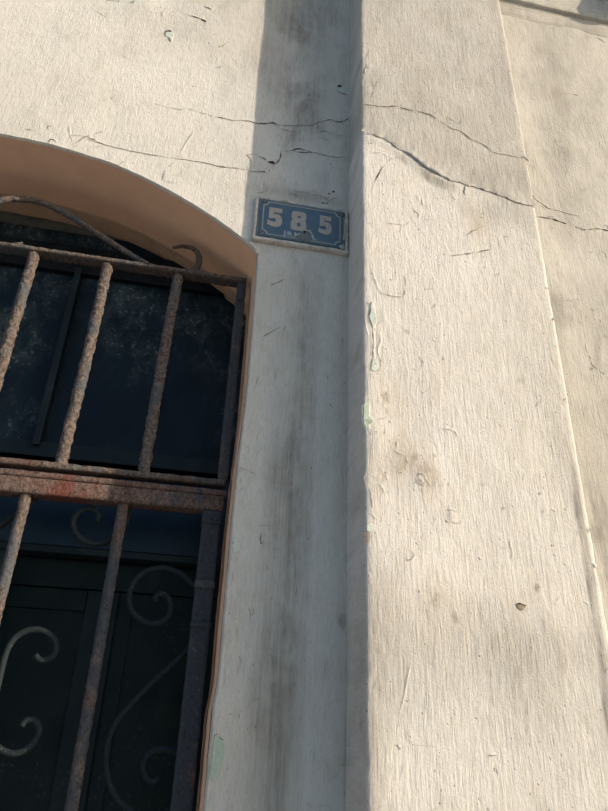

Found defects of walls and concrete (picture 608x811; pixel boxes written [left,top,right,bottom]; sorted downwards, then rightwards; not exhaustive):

crack [26,104,530,184]
crack [533,196,608,232]
peeling [365,301,383,372]
peeling [362,403,388,429]
peeling [210,733,225,782]